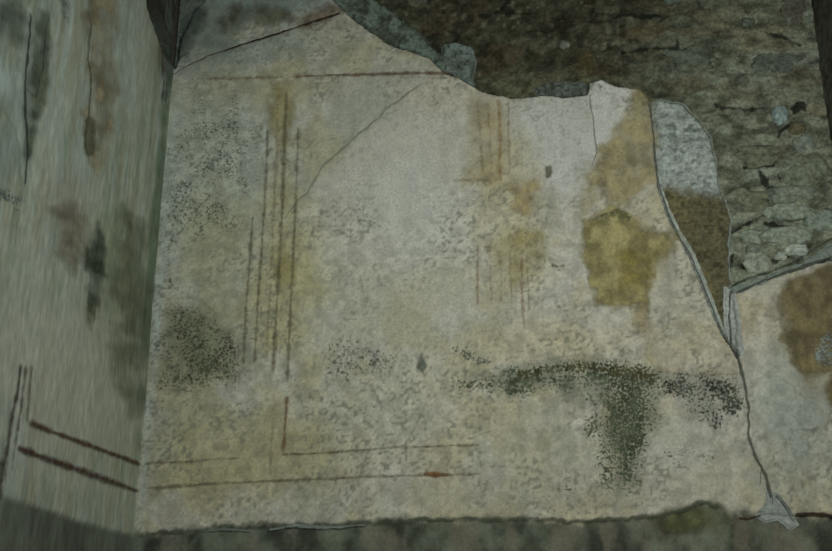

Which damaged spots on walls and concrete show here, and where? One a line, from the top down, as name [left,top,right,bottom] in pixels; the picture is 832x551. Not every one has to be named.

spalling [147,0,206,74]
crack [159,6,340,97]
crack [286,85,420,217]
spalling [333,0,832,346]
leakage [155,303,239,390]
crack [649,105,832,530]
leakage [447,355,744,496]